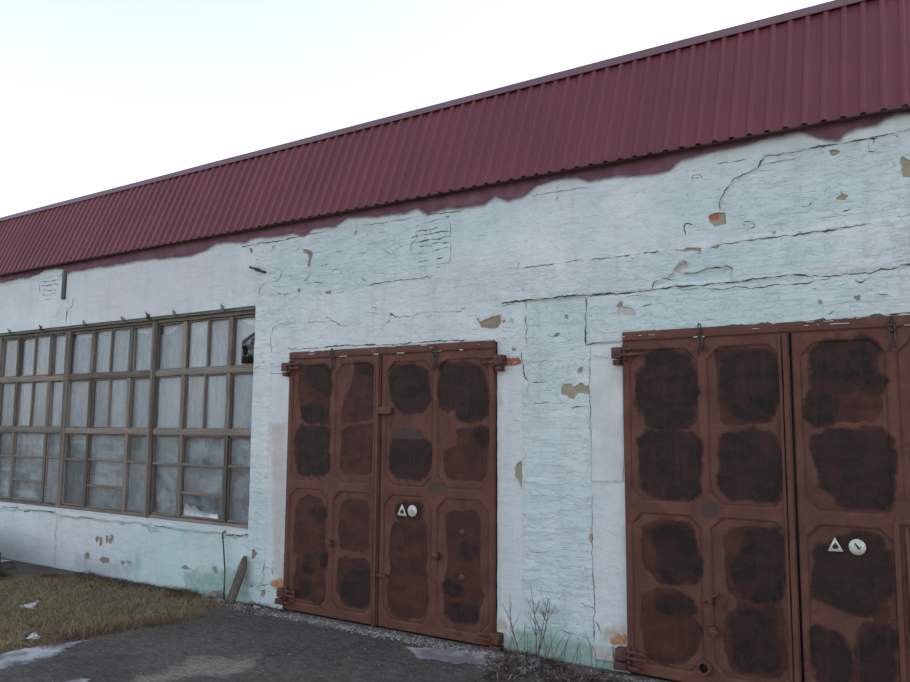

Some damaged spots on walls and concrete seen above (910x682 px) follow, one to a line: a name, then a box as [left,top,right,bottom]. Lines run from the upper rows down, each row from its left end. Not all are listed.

crack [691,129,910,207]
spalling [898,155,910,179]
spalling [707,211,728,229]
crack [724,207,865,244]
crack [241,211,461,296]
spalling [476,314,514,330]
peeling [560,367,591,401]